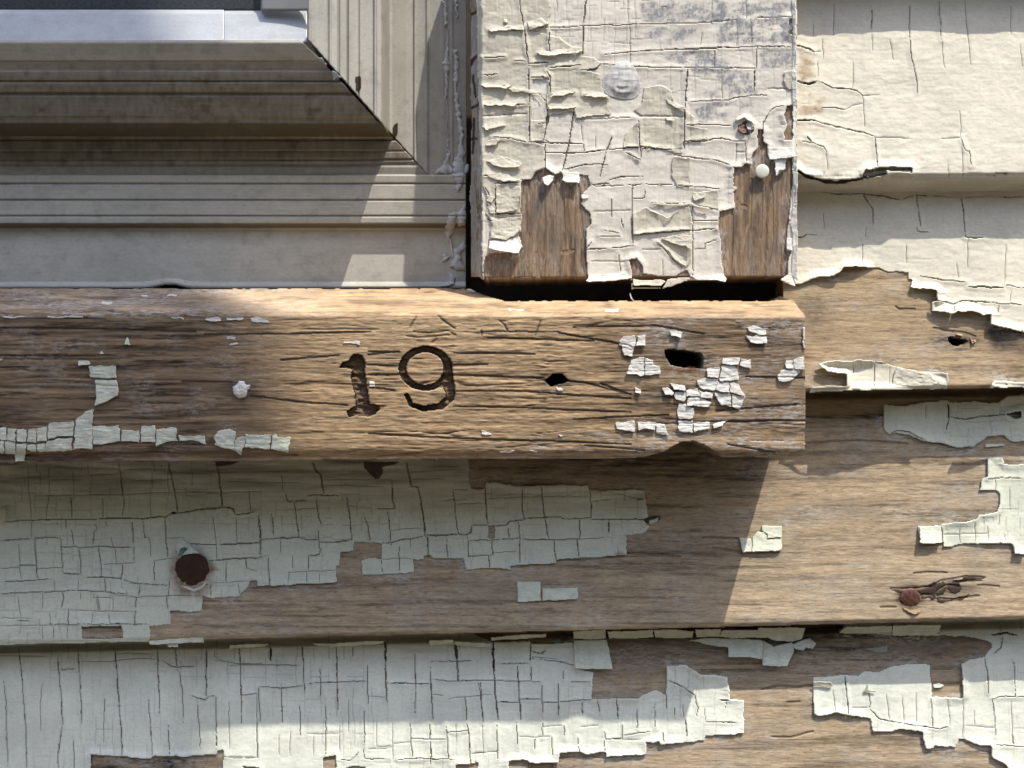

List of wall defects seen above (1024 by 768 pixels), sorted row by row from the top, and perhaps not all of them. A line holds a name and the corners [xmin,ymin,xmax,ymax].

peeling [471,0,1024,394]
crack [483,0,1023,311]
peeling [0,351,291,466]
peeling [82,625,123,643]
peeling [91,750,224,768]
crack [1,462,732,768]
peeling [149,358,1024,768]